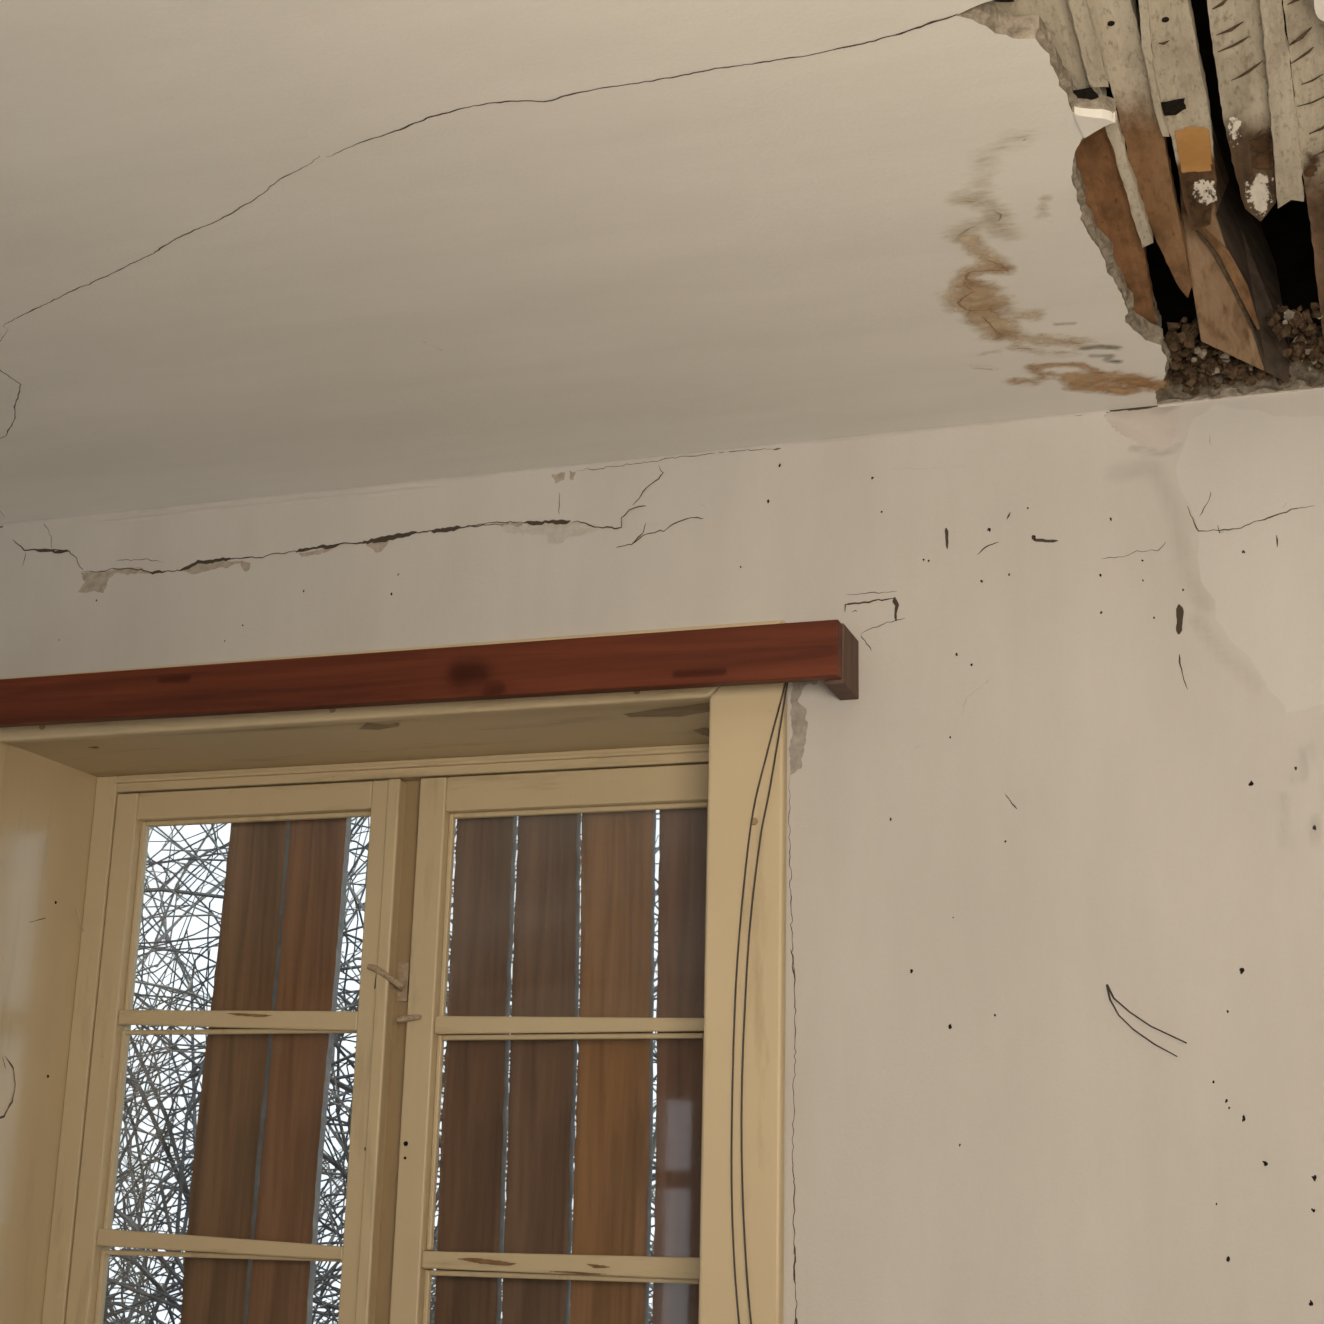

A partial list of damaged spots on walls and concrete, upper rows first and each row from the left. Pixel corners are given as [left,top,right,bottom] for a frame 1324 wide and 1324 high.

crack [0,13,958,438]
spalling [964,0,1324,403]
damp [948,226,1166,395]
spalling [78,567,149,601]
crack [0,448,781,575]
spalling [498,521,600,545]
crack [844,591,904,650]